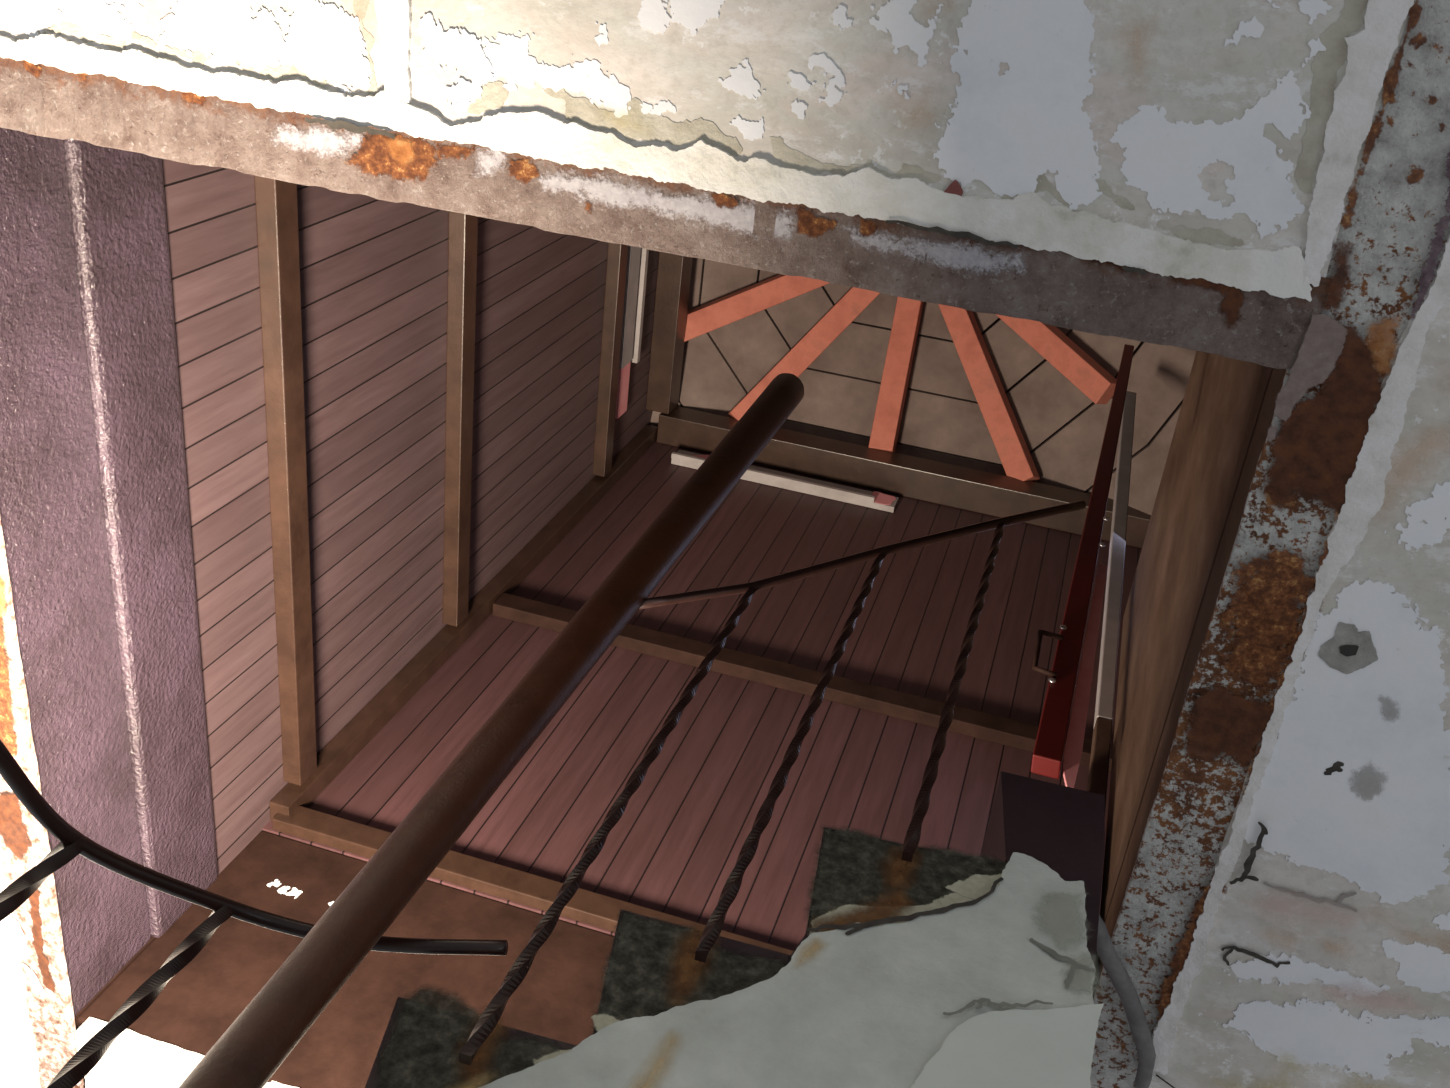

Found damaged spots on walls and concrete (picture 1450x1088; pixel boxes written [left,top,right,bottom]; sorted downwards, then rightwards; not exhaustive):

peeling [0,0,378,96]
rust [346,134,475,183]
peeling [418,0,1368,247]
rust [1185,0,1443,820]
rust [0,579,18,757]
peeling [1245,578,1450,905]
rust [0,793,32,860]
rust [28,890,55,993]
flaking render [593,911,787,1034]
flaking render [807,827,1008,932]
rust [1156,870,1227,1021]
peeling [1222,937,1450,1081]